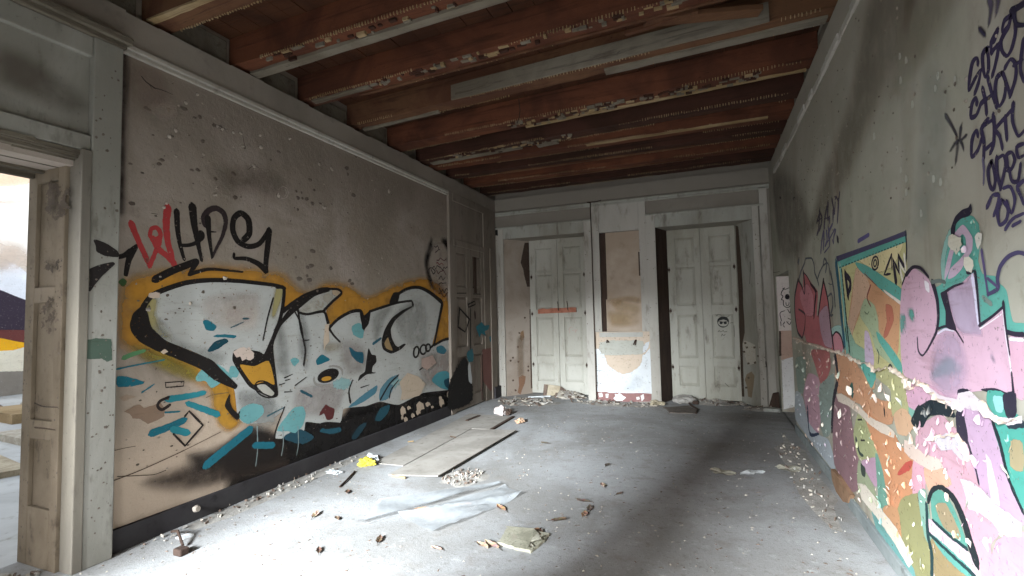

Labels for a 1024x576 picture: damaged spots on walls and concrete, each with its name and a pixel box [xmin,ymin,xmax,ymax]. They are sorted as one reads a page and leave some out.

peeling [598,383,657,401]
peeling [793,336,1022,576]